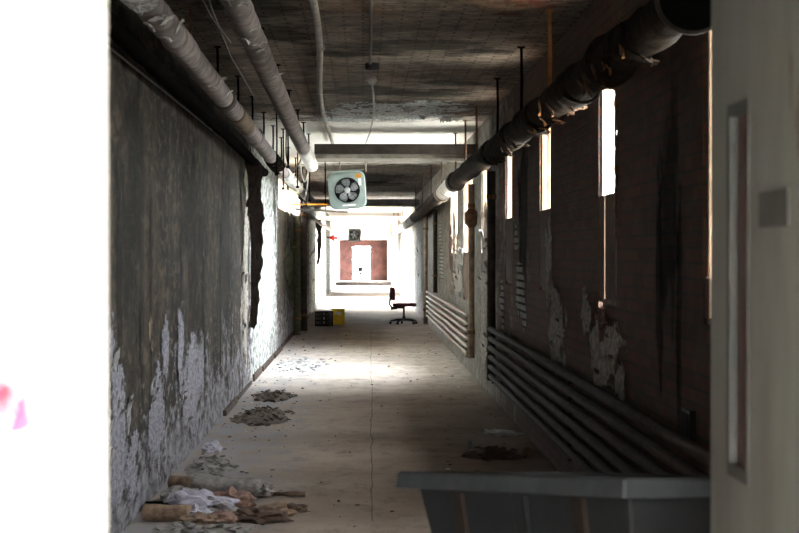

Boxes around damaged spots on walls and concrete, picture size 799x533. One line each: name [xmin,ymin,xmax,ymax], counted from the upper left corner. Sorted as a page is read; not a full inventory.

peeling [240,161,275,367]
peeling [285,224,296,301]
peeling [109,306,205,519]